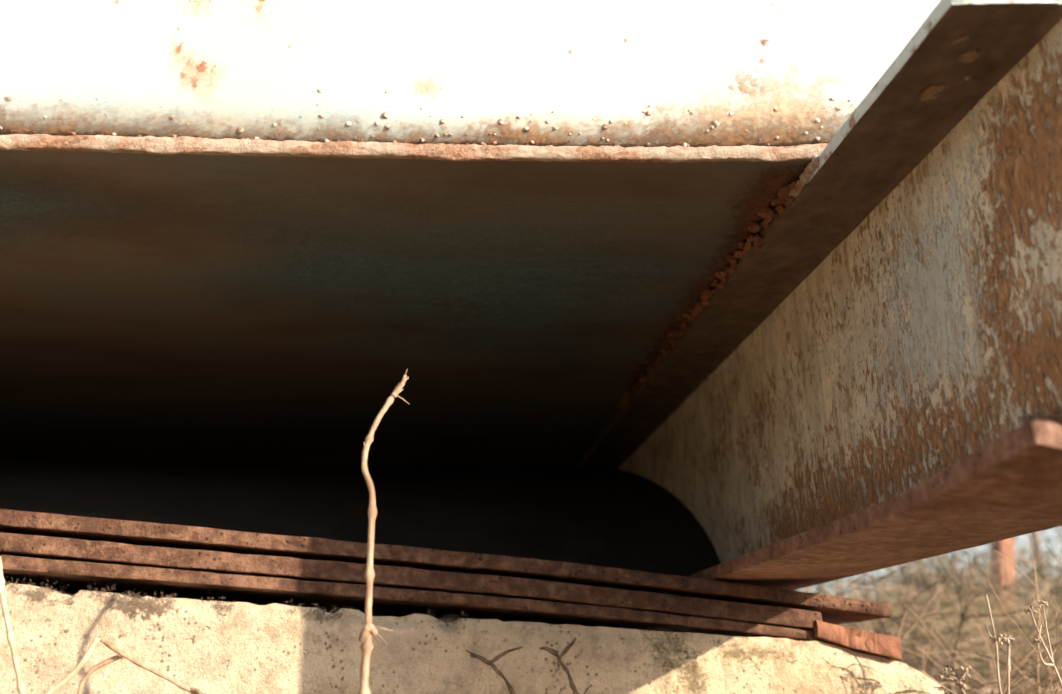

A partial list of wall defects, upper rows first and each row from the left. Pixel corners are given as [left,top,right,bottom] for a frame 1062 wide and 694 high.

corrosion [0,39,853,148]
corrosion [760,33,1062,546]
crack [821,656,930,694]